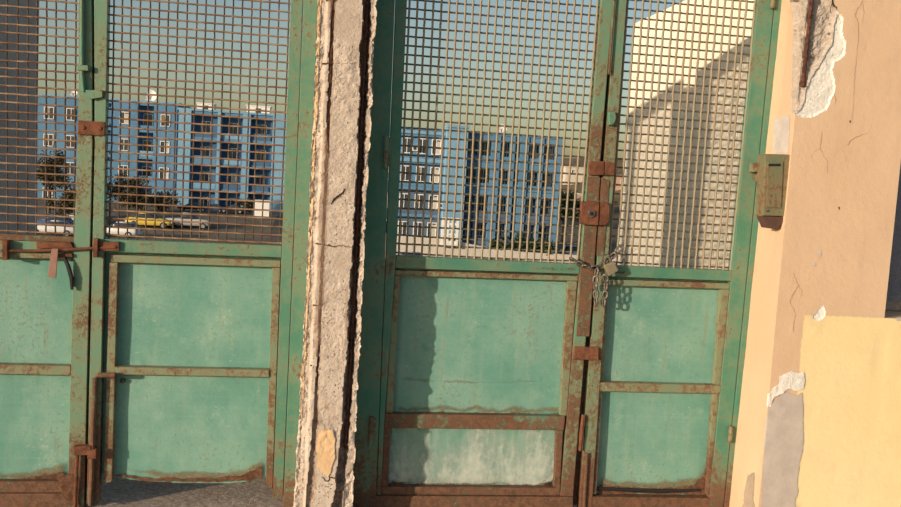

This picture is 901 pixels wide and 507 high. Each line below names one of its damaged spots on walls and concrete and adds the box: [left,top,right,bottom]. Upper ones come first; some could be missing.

spalling [773,0,846,153]
crack [830,0,869,145]
spalling [316,1,335,386]
spalling [344,0,368,448]
flaking render [767,371,805,408]
flaking render [813,305,826,321]